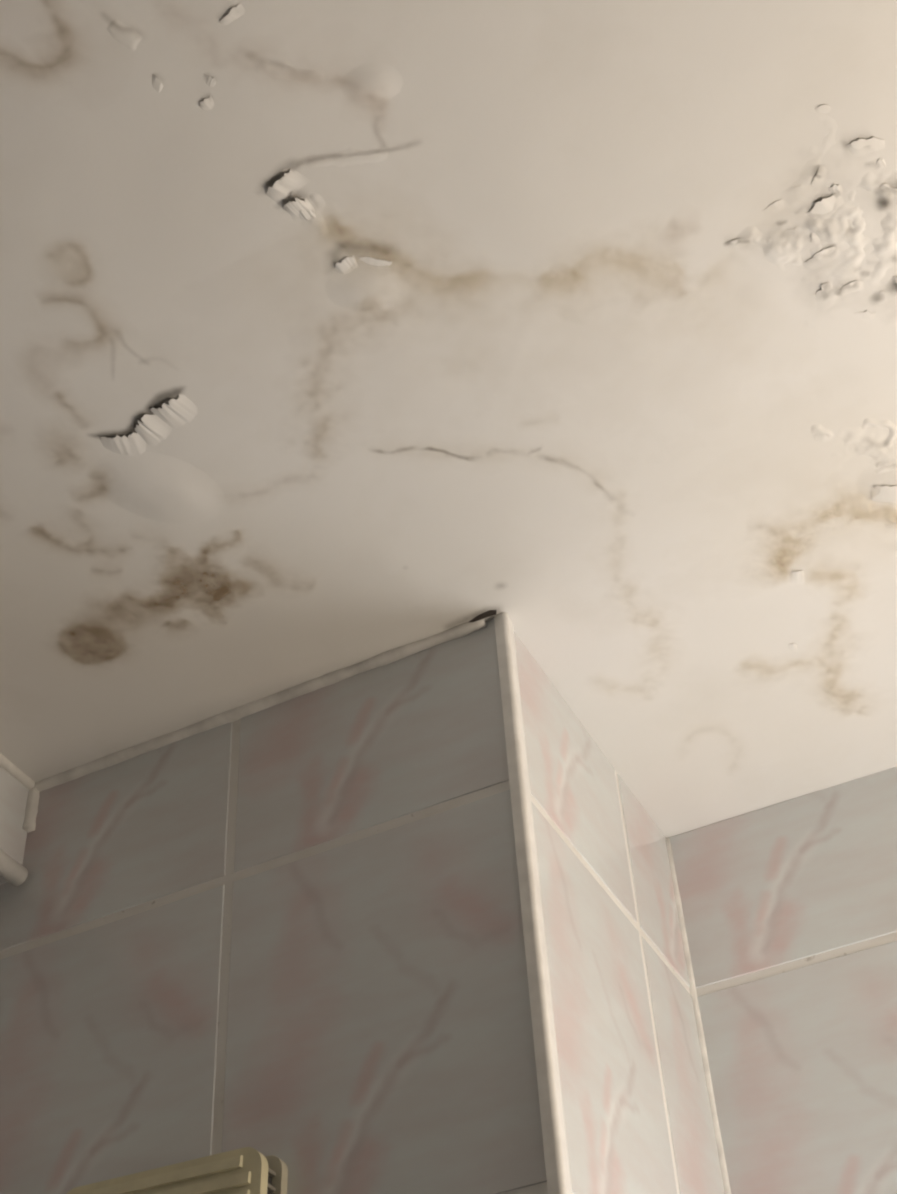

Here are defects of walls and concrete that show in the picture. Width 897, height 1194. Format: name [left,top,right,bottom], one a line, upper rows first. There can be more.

crack [306,147,388,168]
peeling [98,391,198,456]
water stain [153,550,231,606]